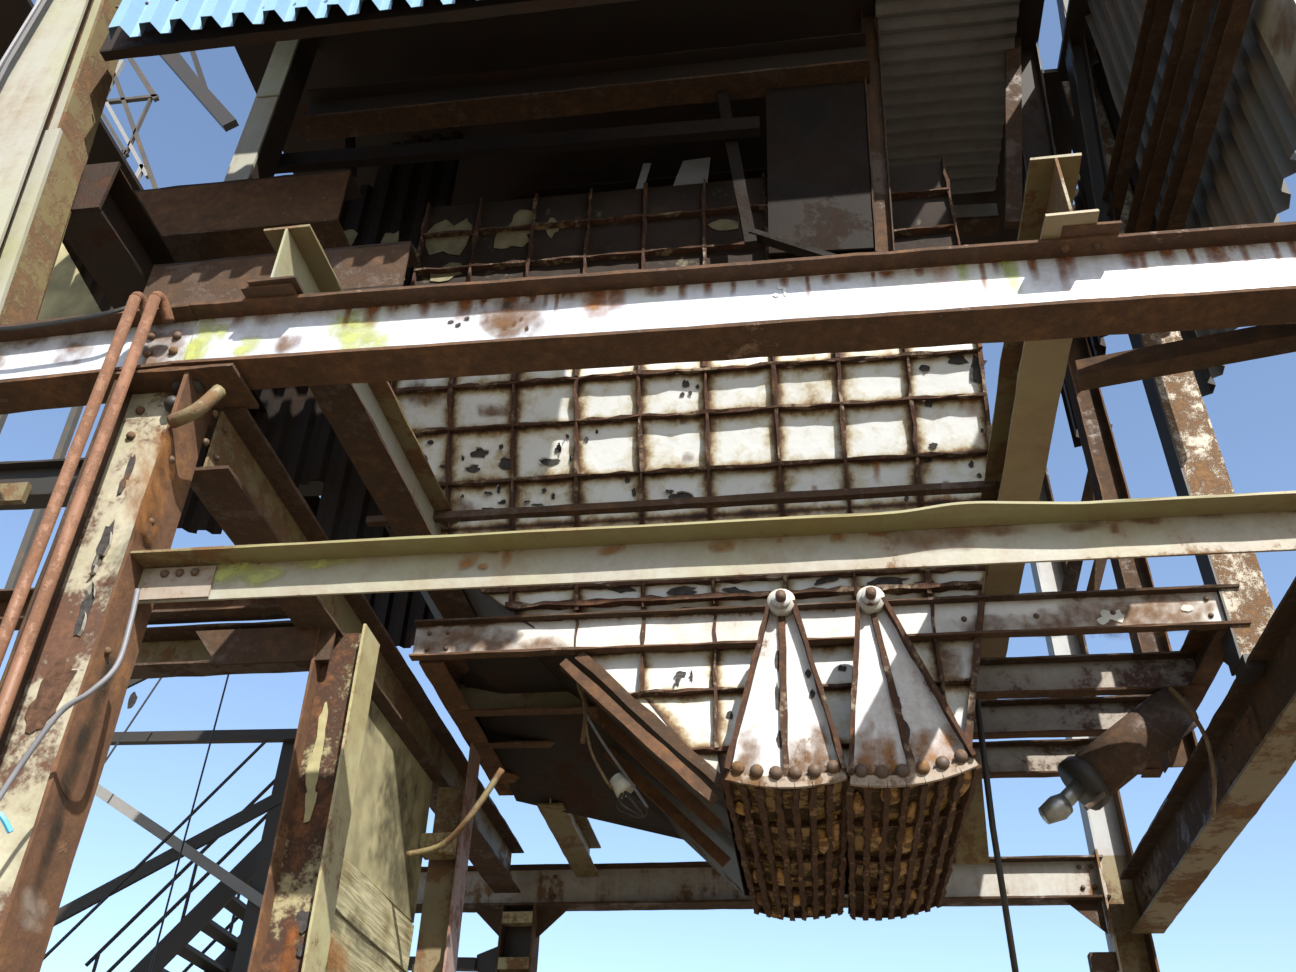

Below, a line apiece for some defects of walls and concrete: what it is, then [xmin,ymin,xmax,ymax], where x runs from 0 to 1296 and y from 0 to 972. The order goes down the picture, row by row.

peeling [494,210,559,249]
peeling [413,219,472,282]
rust [1161,246,1222,261]
rust [420,299,486,313]
rust [504,289,623,310]
peeling [948,354,987,383]
rust [479,407,507,415]
peeling [461,444,511,473]
peeling [538,429,598,466]
peeling [665,489,694,499]
rust [897,525,1008,548]
rust [858,740,896,775]